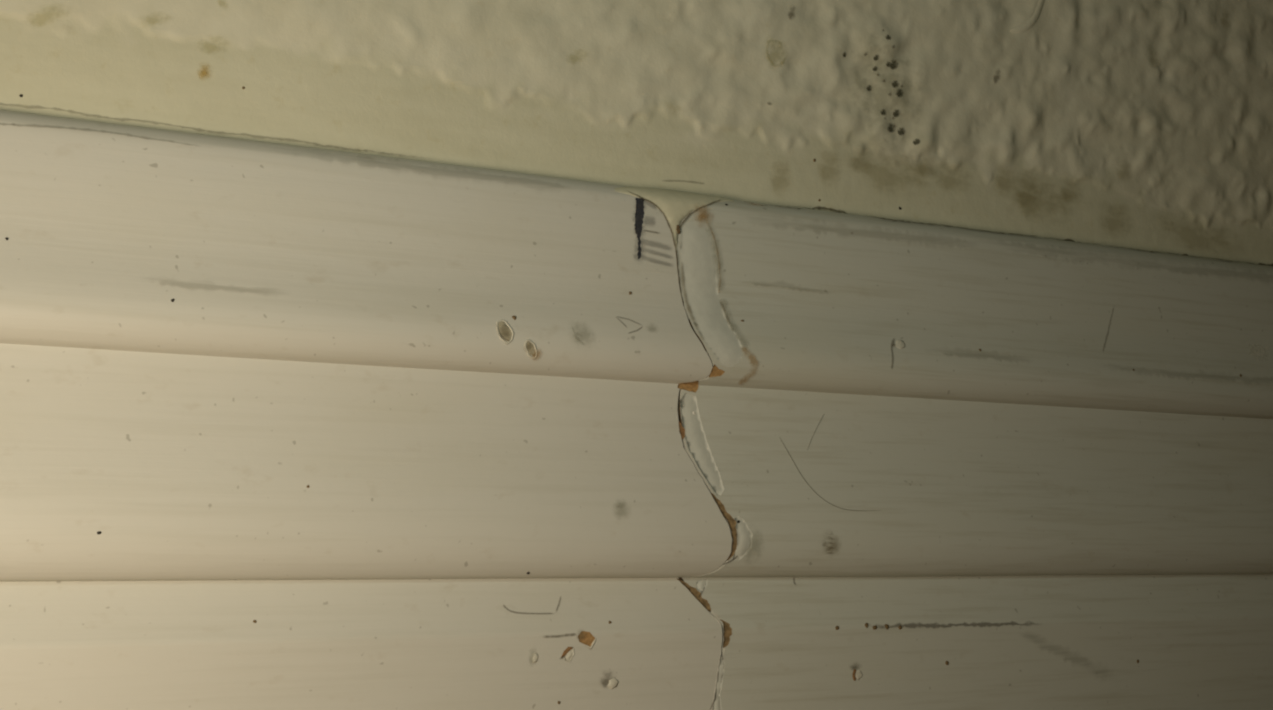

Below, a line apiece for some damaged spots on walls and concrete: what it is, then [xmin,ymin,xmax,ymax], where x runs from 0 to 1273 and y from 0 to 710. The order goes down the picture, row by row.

leakage [873,56,920,145]
crack [676,256,725,439]
crack [711,493,737,560]
peeling [561,631,596,662]
crack [677,577,732,648]